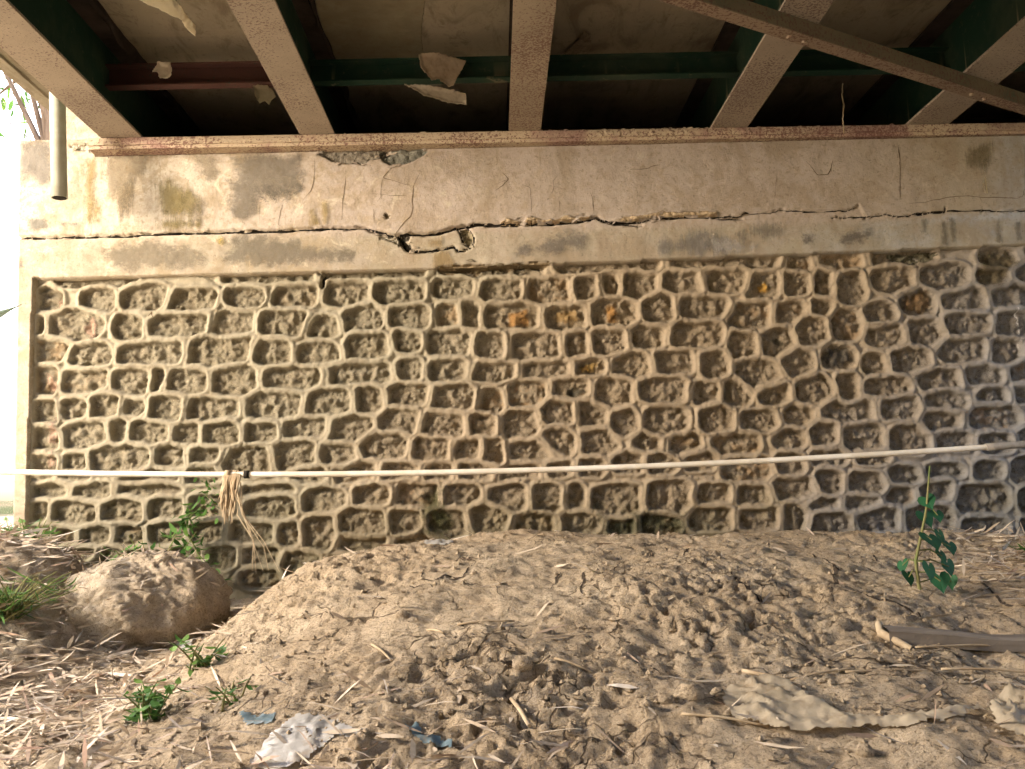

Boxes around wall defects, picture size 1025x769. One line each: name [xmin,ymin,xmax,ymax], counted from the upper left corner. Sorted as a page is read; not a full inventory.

damp [27,218,45,230]
damp [107,155,143,216]
damp [230,154,302,218]
crack [11,147,1025,254]